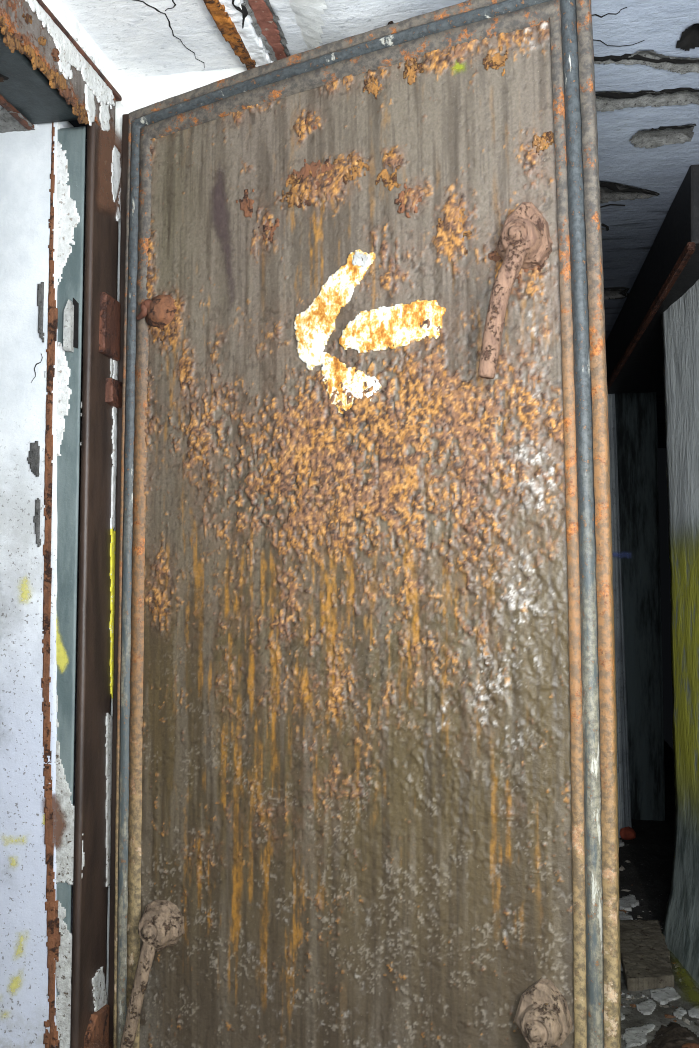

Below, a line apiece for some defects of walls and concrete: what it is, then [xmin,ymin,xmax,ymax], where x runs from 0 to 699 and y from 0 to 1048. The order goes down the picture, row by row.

crack [133,0,205,68]
rust [483,46,508,76]
spalling [594,23,699,74]
rust [0,0,122,213]
spalling [595,87,699,112]
rust [532,131,554,155]
peeling [57,122,80,285]
rust [279,151,423,218]
spalling [599,181,659,208]
peeling [44,342,82,456]
peeling [27,441,40,477]
rust [41,122,61,1048]